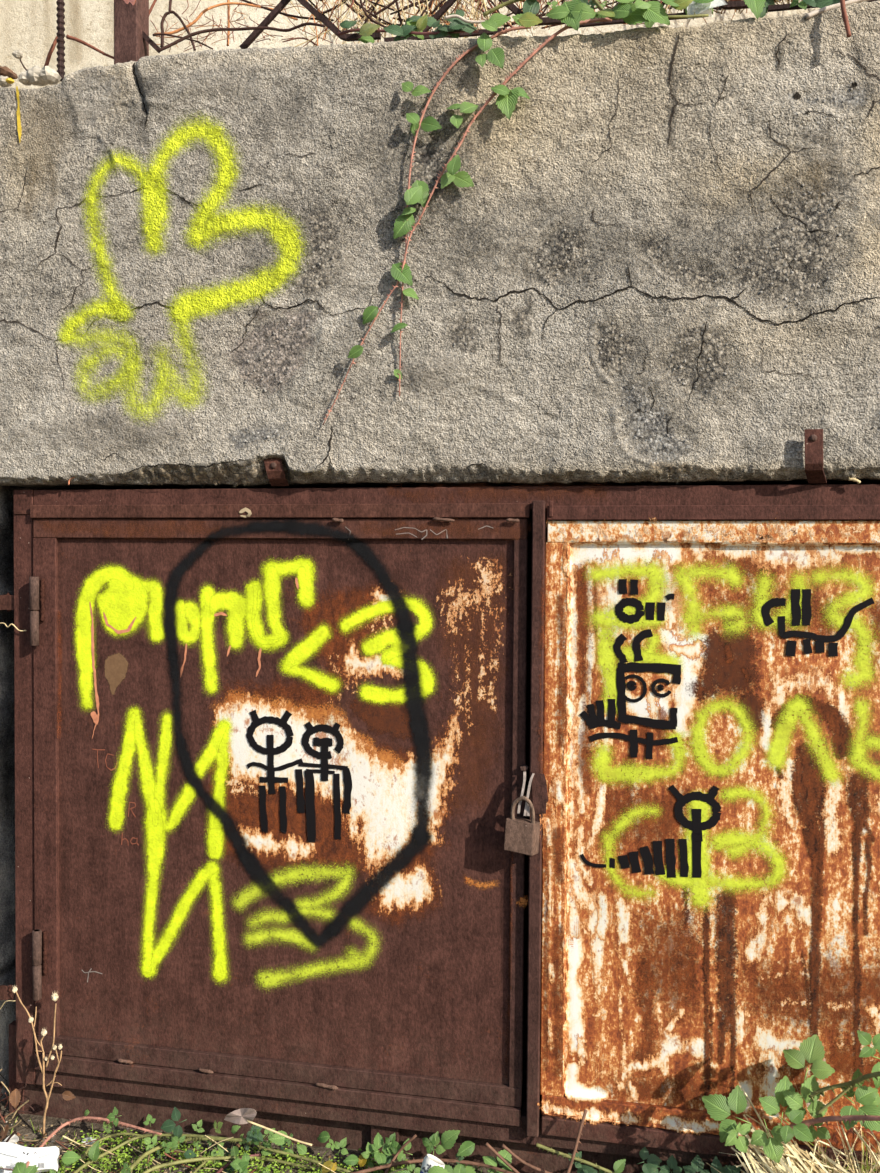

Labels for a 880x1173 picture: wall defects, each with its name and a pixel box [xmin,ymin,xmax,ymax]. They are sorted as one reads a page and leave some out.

crack [668,33,730,169]
crack [741,120,840,233]
crack [0,186,202,396]
crack [230,291,385,353]
crack [427,264,880,439]
rust [209,758,394,875]
rust [214,586,417,773]
peeling [211,556,511,917]
rust [541,559,598,794]
peeling [537,517,880,1136]
rust [685,557,843,732]
rust [743,954,880,1087]